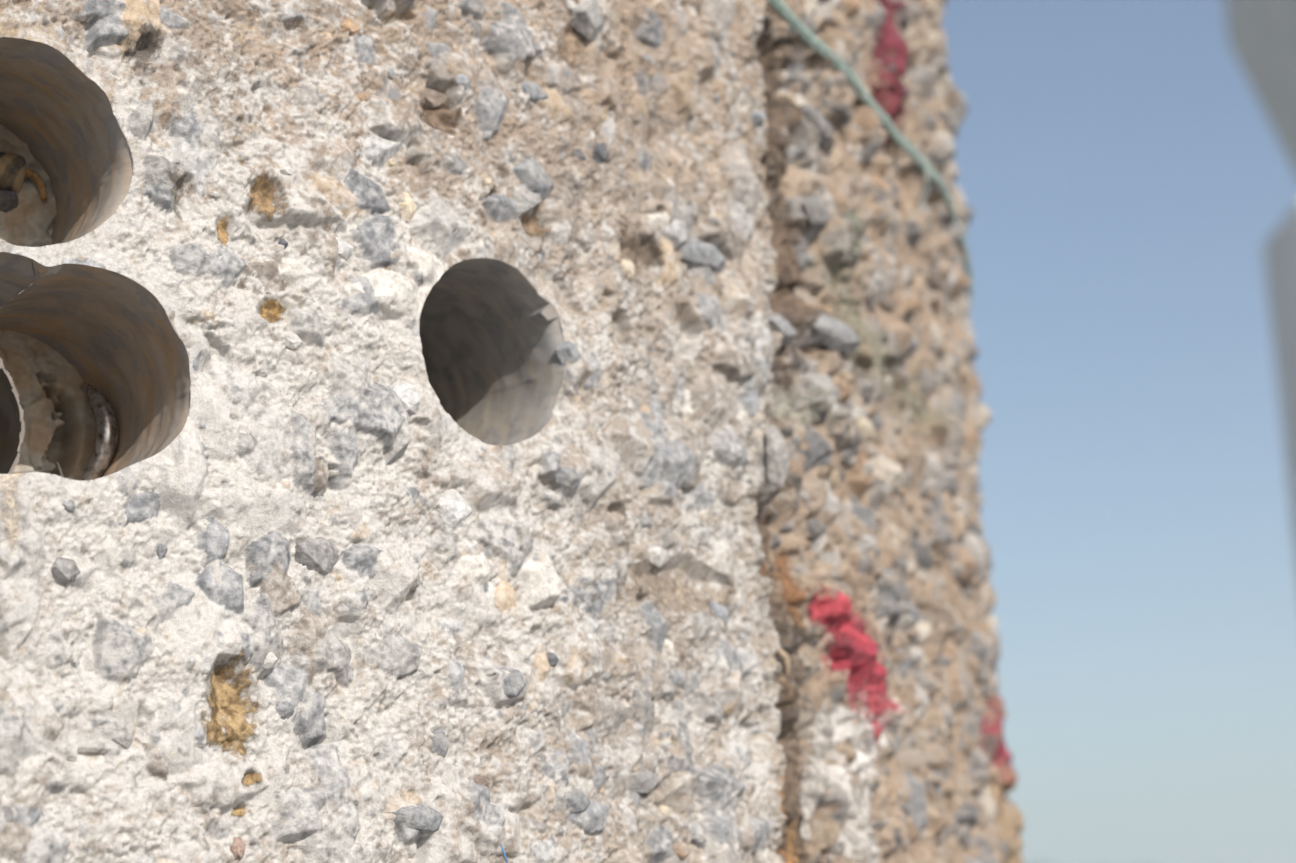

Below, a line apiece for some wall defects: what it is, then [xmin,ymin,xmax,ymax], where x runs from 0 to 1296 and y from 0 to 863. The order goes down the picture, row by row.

crack [730,15,844,443]
crack [735,478,830,863]
corrosion [760,548,808,629]
corrosion [777,776,799,863]